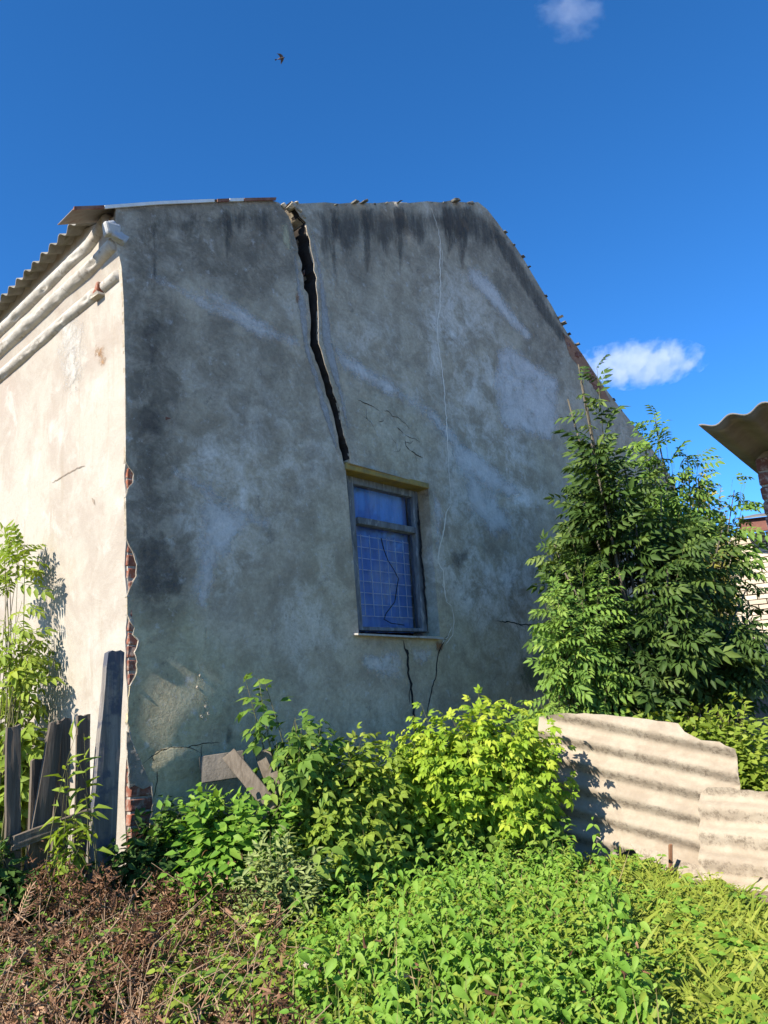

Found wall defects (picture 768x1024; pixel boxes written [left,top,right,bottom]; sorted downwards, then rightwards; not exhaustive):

crack [281,201,423,461]
water stain [323,209,564,339]
crack [403,211,454,731]
spalling [124,538,138,597]
spalling [125,610,140,686]
crack [144,742,218,795]